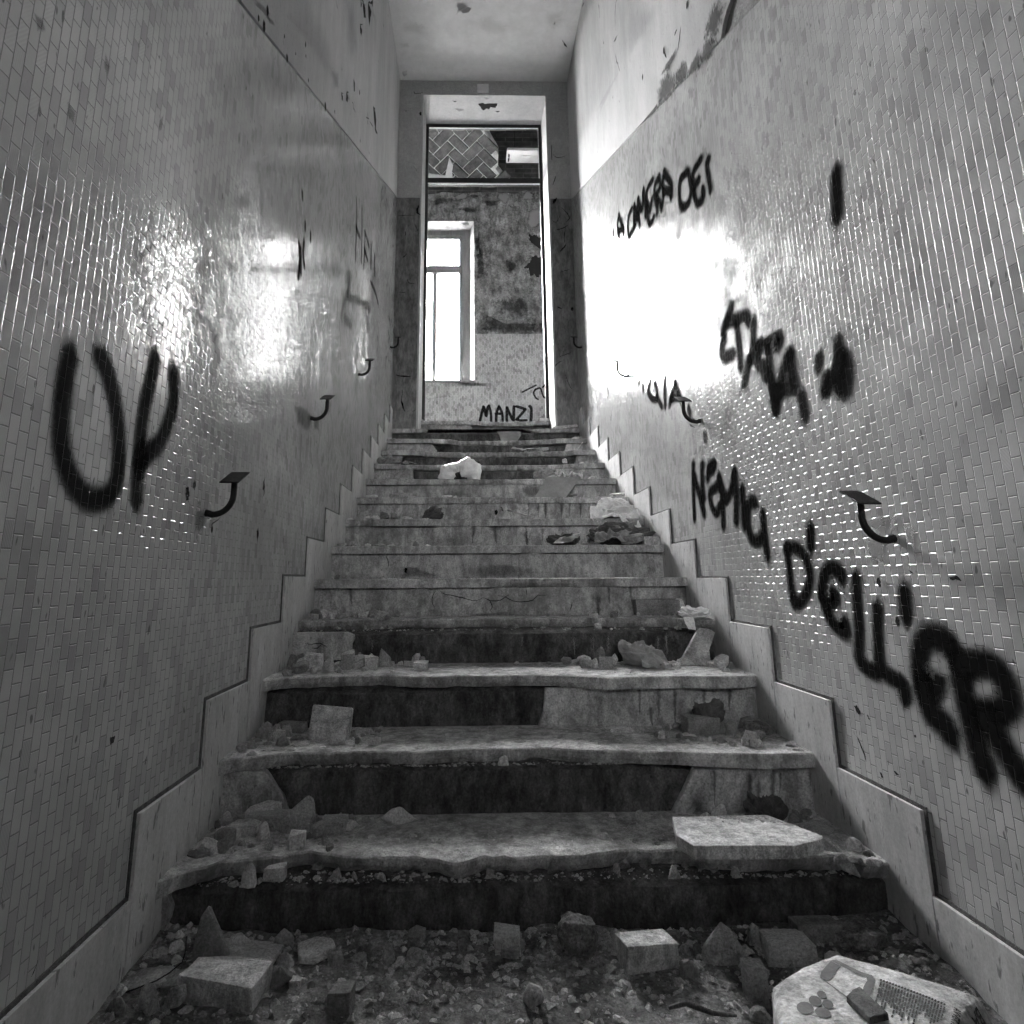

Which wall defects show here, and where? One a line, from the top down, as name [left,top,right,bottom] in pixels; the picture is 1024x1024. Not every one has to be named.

crack [432,590,545,611]
flaking render [668,865,681,879]